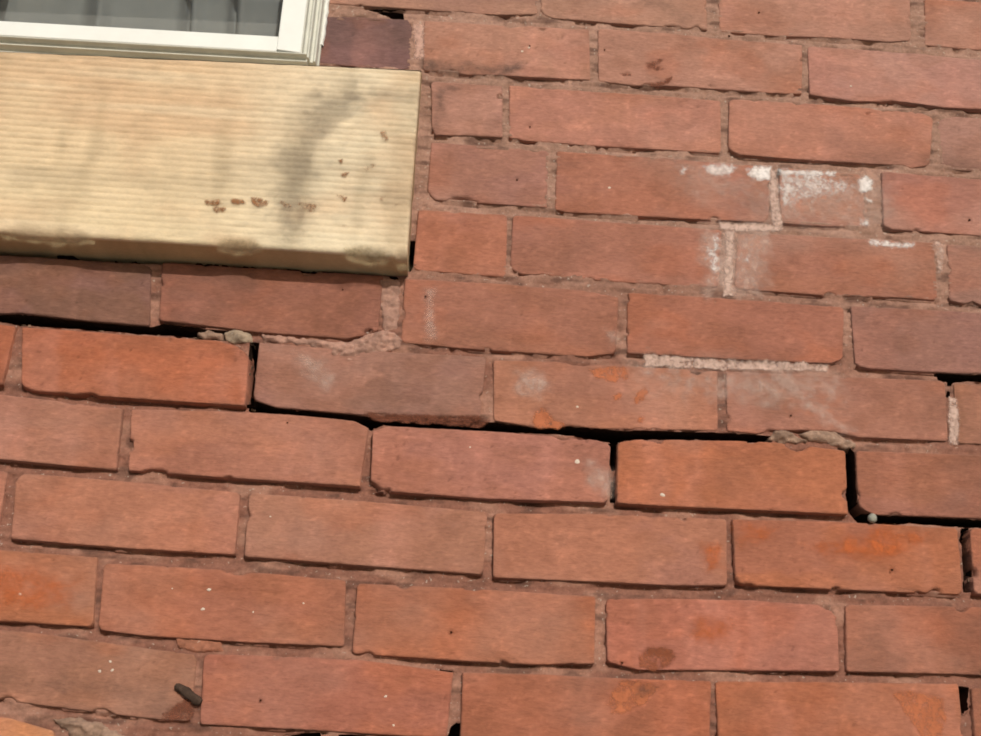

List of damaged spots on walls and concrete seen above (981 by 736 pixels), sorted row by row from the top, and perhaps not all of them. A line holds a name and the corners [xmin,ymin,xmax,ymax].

leakage [707,165,735,175]
leakage [859,176,872,192]
leakage [710,166,845,296]
crack [57,253,79,261]
crack [195,263,399,280]
crack [934,373,981,398]
crack [0,314,770,503]
crack [838,449,981,593]